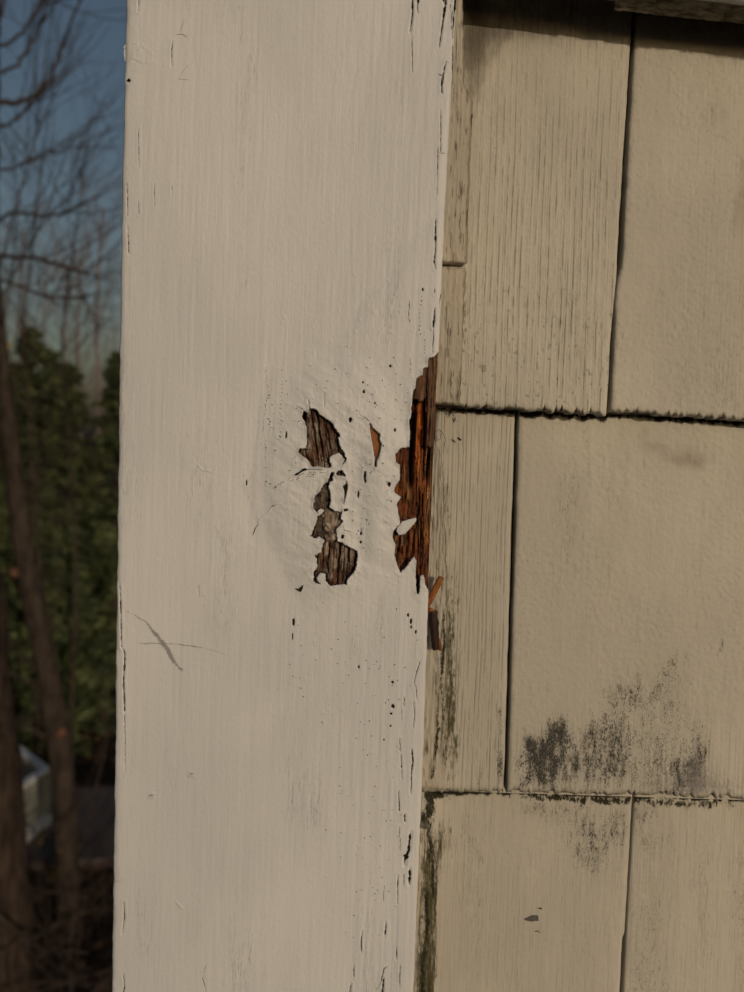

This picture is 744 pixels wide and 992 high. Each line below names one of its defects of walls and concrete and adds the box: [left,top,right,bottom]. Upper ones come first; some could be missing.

crack [410,0,419,72]
crack [437,0,457,181]
peeling [299,409,357,586]
peeling [370,425,381,466]
water stain [519,654,707,792]